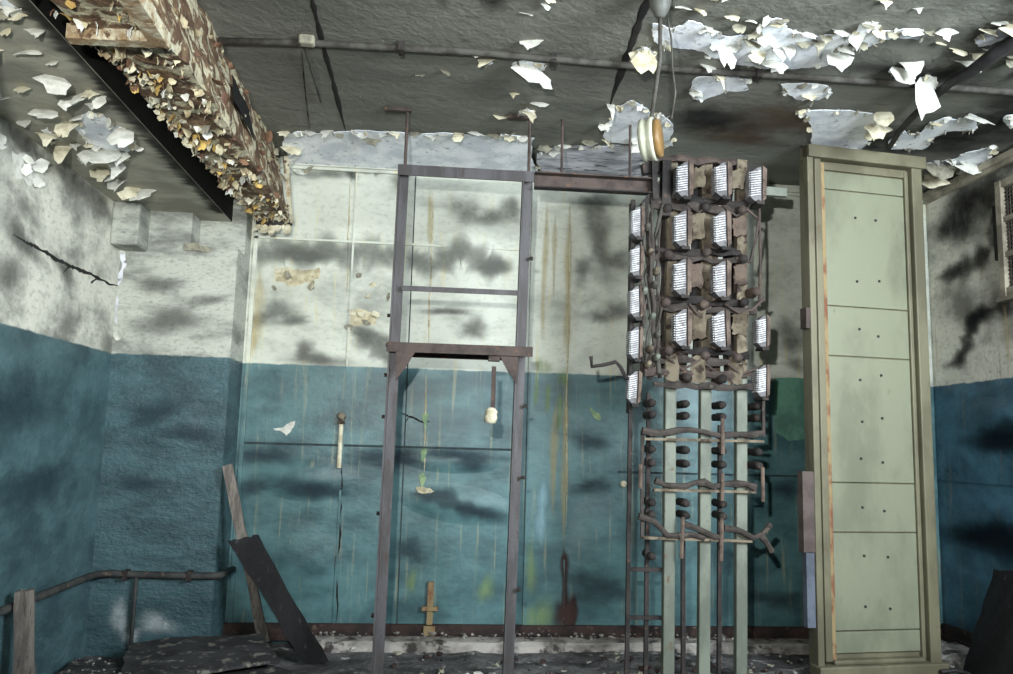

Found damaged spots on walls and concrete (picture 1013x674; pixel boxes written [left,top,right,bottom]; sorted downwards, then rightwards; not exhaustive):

peeling [0,0,45,38]
peeling [629,6,1013,152]
peeling [0,49,156,201]
peeling [50,0,677,235]
peeling [922,145,998,192]
water stain [937,214,976,240]
crack [15,235,118,286]
peeling [271,267,320,291]
water stain [967,311,982,325]
water stain [996,302,1013,316]
crack [335,469,343,623]
corrosion [556,552,577,625]